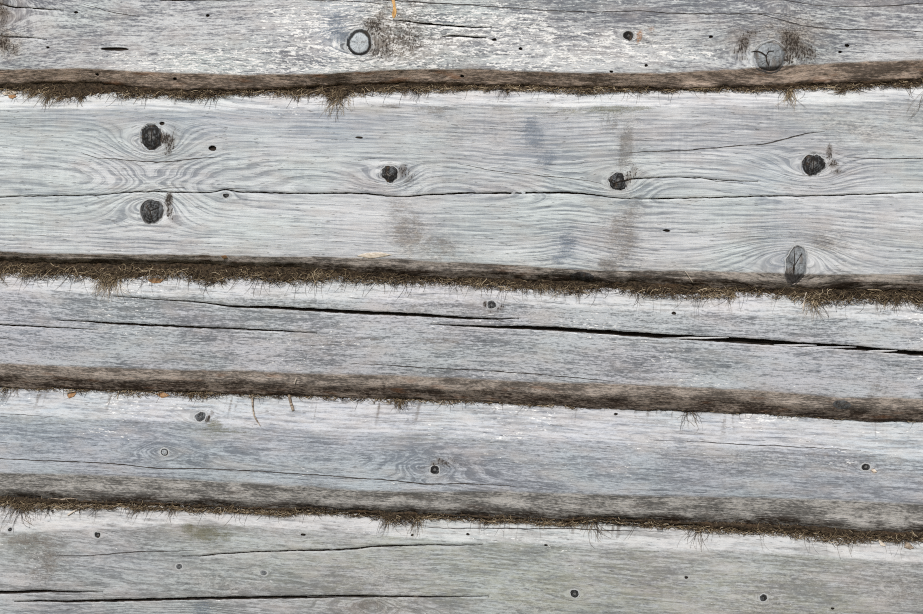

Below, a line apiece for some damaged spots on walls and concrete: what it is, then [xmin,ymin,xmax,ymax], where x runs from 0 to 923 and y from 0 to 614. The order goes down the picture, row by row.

crack [632,131,825,153]
crack [81,152,215,163]
crack [854,154,923,162]
crack [0,164,923,202]
crack [0,294,923,359]
crack [63,527,664,560]
crack [0,587,488,605]